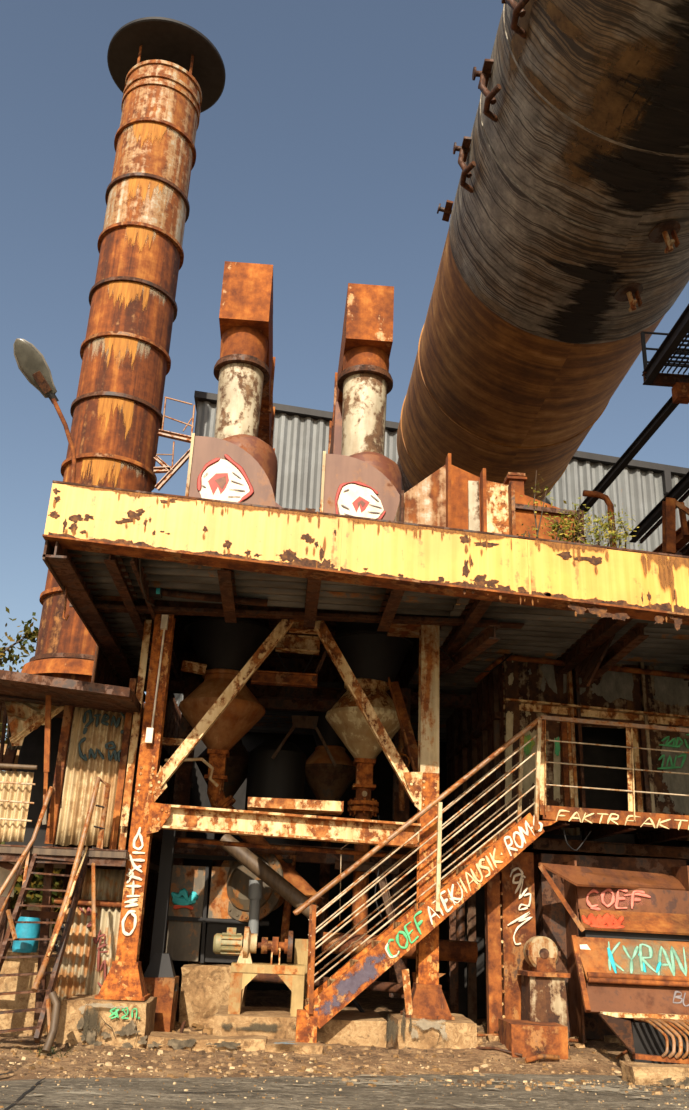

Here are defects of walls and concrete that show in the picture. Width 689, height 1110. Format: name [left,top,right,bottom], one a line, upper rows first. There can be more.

rust [397,230,664,501]
crack [0,1070,46,1110]